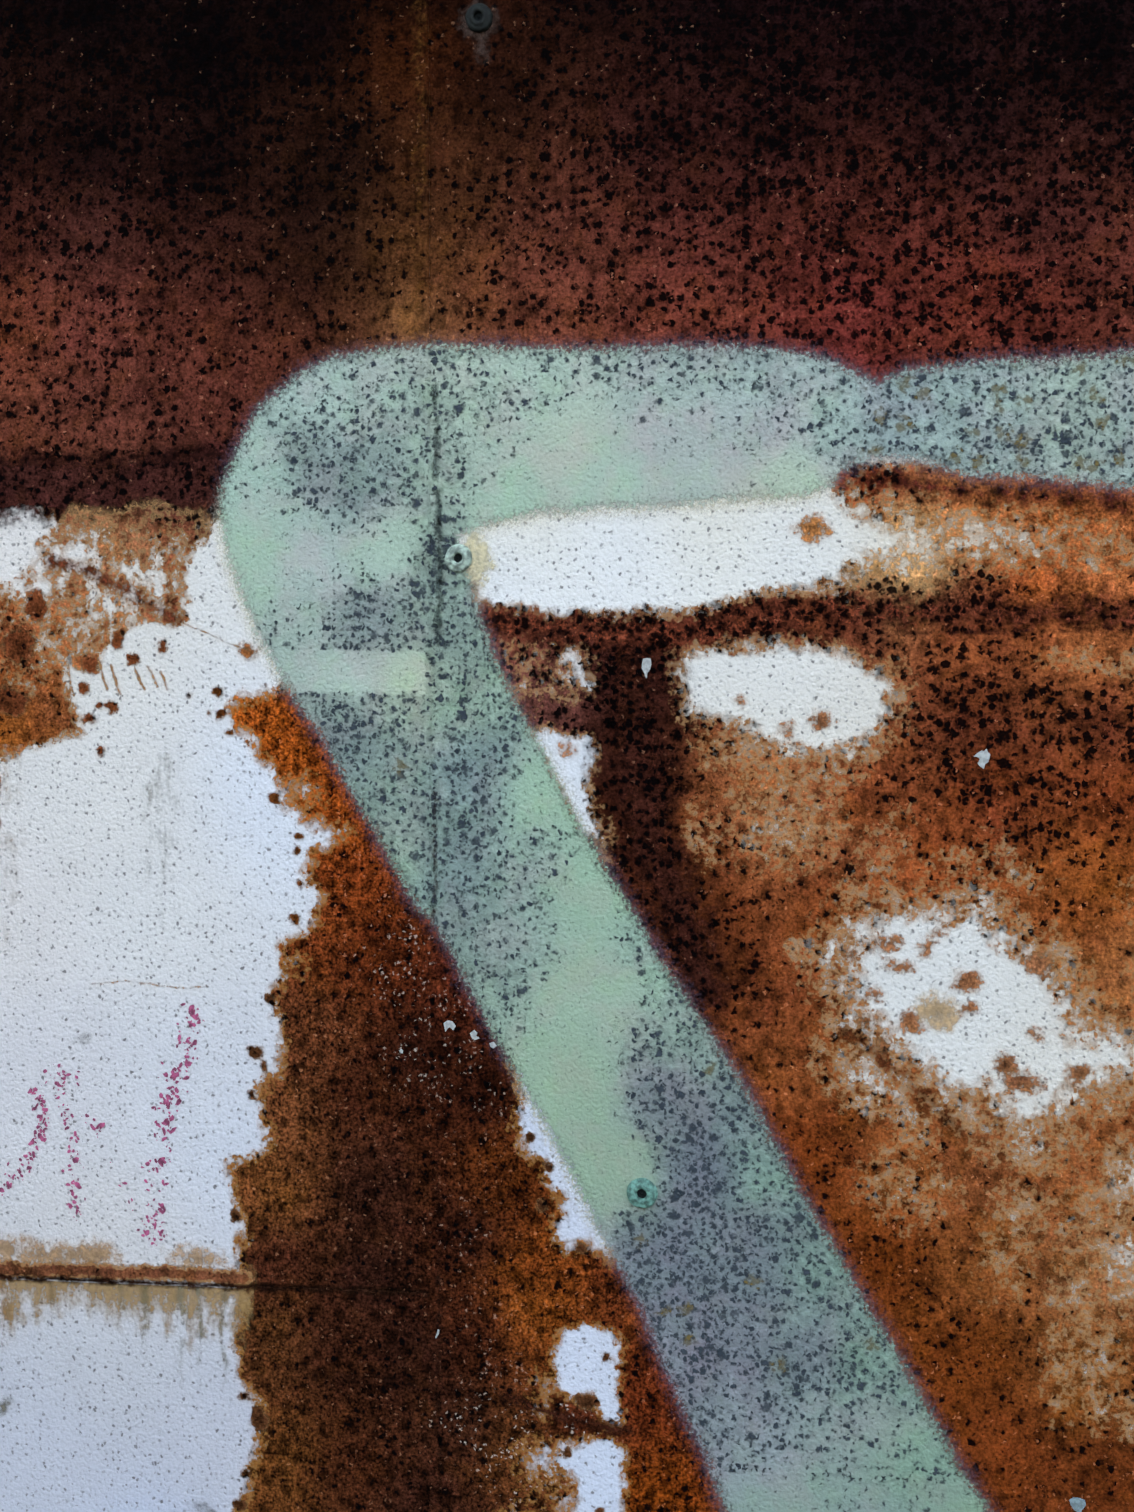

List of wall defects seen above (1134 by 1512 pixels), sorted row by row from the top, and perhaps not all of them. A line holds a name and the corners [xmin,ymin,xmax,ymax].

corrosion [0,0,1134,788]
corrosion [0,681,730,1512]
corrosion [464,460,1134,1512]